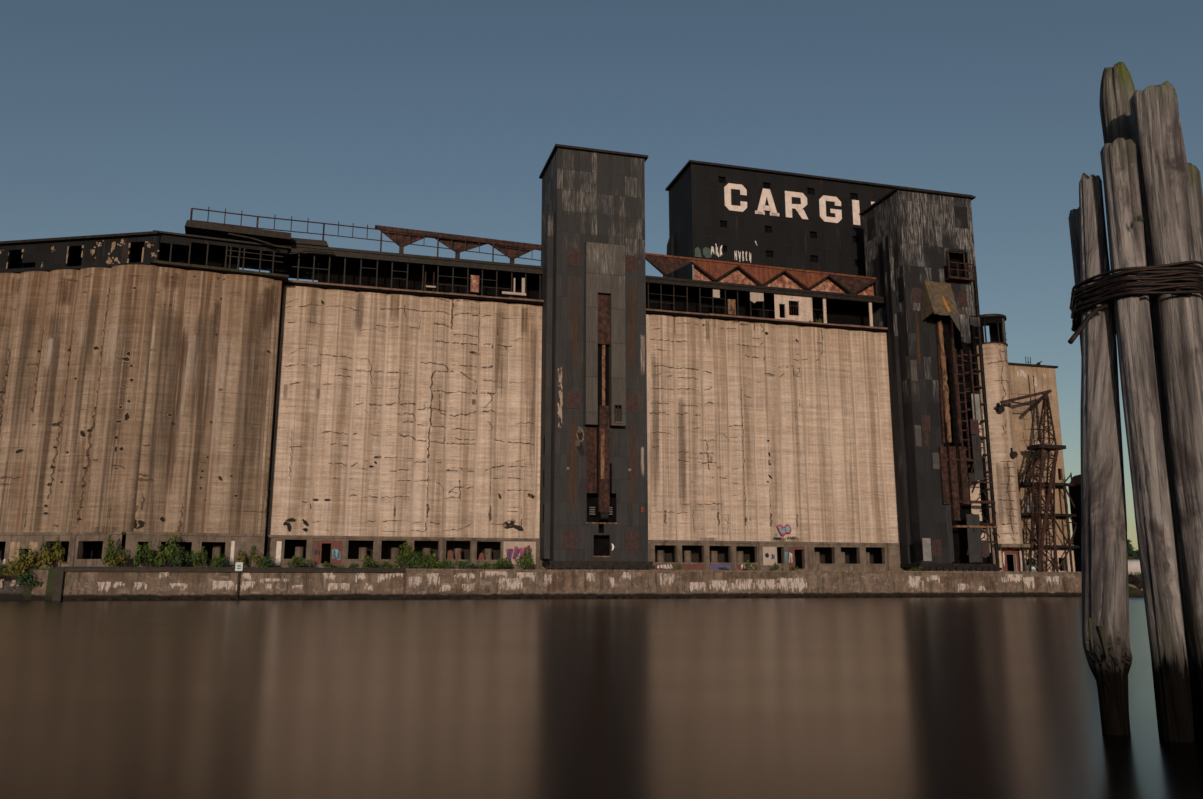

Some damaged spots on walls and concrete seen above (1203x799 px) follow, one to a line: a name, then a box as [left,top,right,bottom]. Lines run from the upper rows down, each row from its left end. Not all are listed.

damp [149,318,224,421]
crack [244,298,534,532]
crack [650,321,823,532]